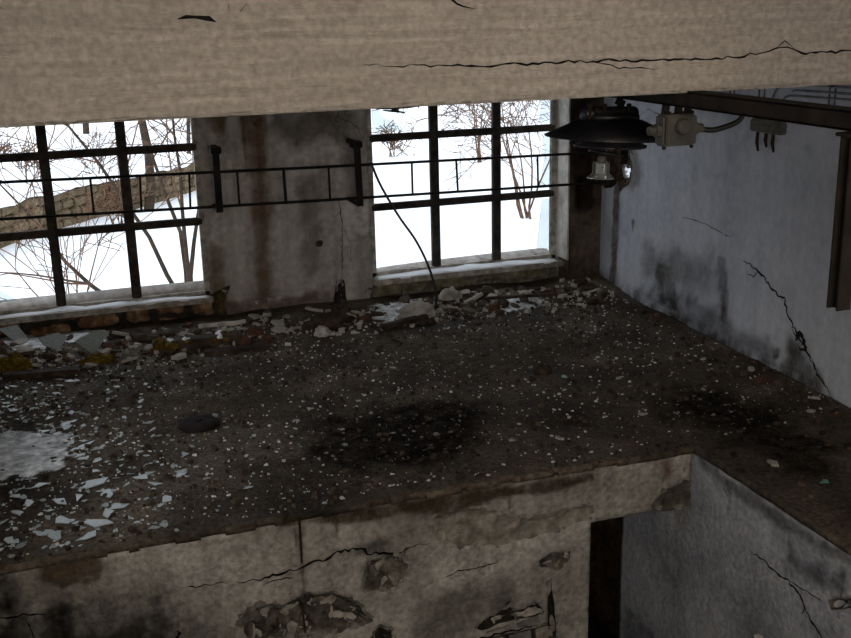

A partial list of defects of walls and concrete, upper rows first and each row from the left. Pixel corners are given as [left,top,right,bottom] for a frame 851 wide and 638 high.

crack [371,40,851,70]
crack [743,261,830,395]
leakage [764,340,822,392]
crack [183,542,432,588]
flaking render [235,552,408,638]
flaking render [475,600,558,638]
crack [480,579,558,638]
crack [753,554,822,638]